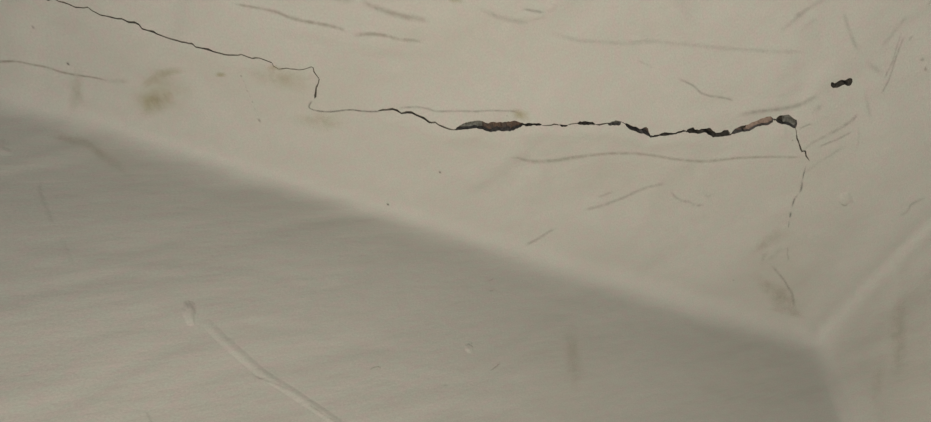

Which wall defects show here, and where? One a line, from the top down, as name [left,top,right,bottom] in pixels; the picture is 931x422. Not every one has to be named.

crack [47,0,320,98]
crack [358,108,809,160]